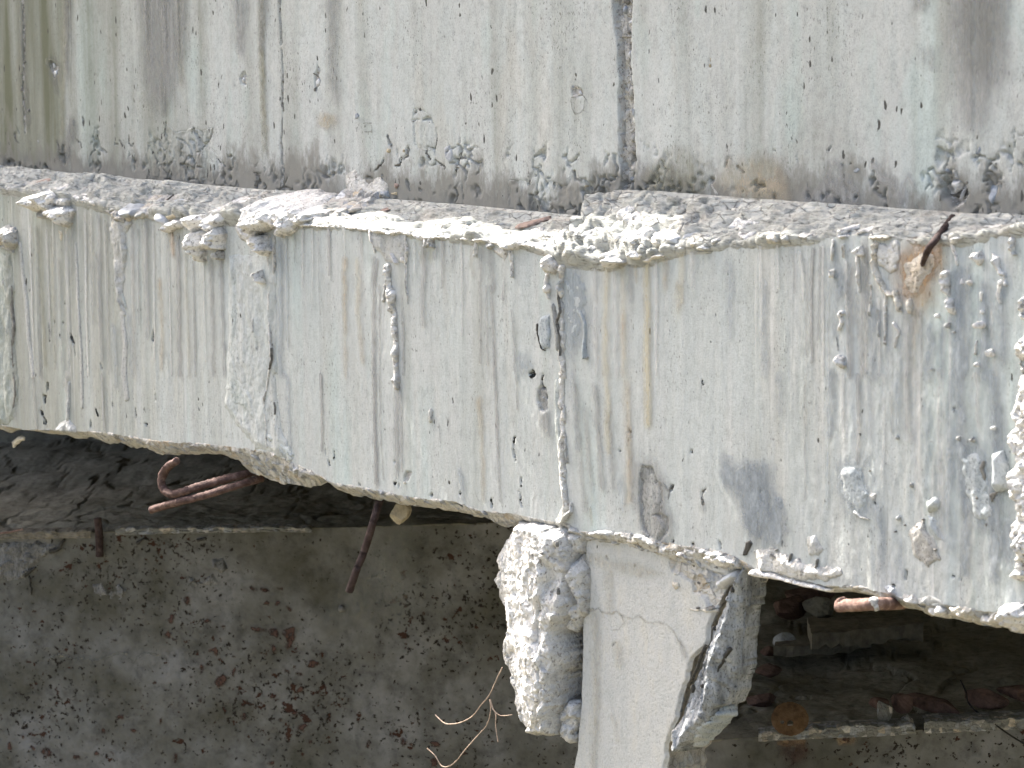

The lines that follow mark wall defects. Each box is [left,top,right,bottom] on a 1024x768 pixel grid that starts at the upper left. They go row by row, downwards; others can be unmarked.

spalling [105,193,197,225]
spalling [323,188,391,217]
spalling [515,216,551,229]
spalling [581,205,697,268]
spalling [939,168,998,208]
corrosion [902,246,942,305]
water stain [697,217,969,574]
water stain [975,284,1024,581]
spalling [669,559,741,612]
spalling [802,596,834,618]